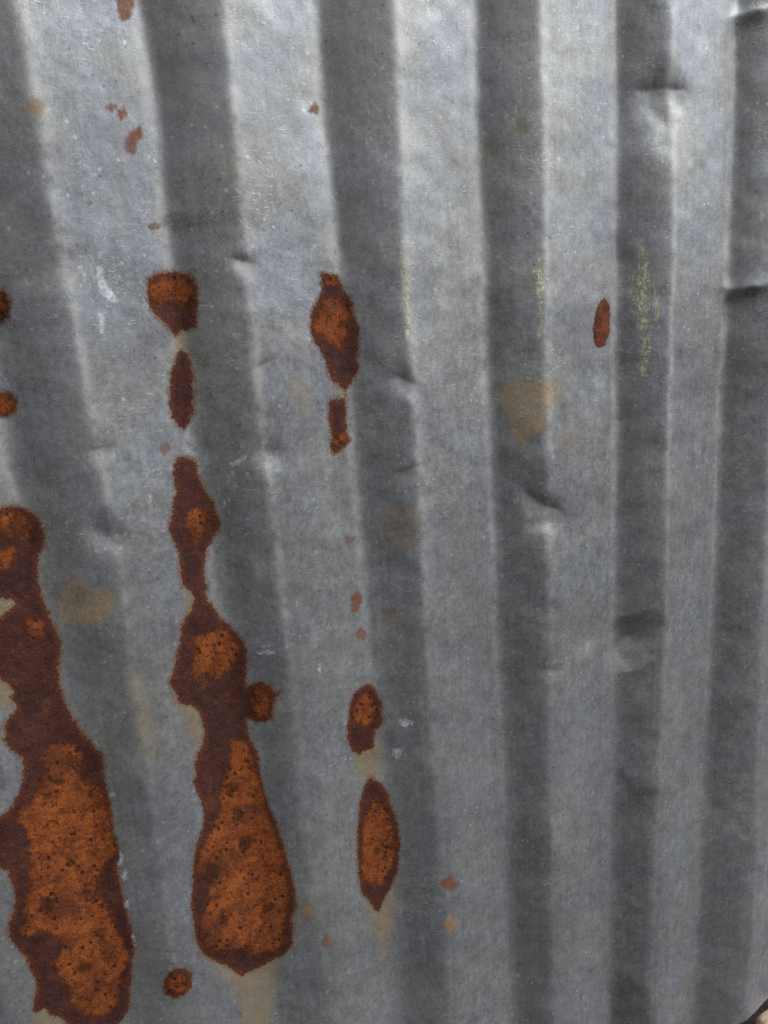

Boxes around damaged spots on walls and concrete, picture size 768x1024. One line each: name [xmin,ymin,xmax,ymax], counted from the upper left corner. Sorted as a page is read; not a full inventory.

corrosion [117,0,134,20]
corrosion [0,290,12,323]
corrosion [145,270,200,430]
corrosion [309,271,361,455]
corrosion [593,296,611,347]
corrosion [0,391,18,417]
corrosion [160,443,313,977]
corrosion [346,684,387,756]
corrosion [0,504,137,1024]
corrosion [355,775,402,912]
corrosion [163,967,194,999]